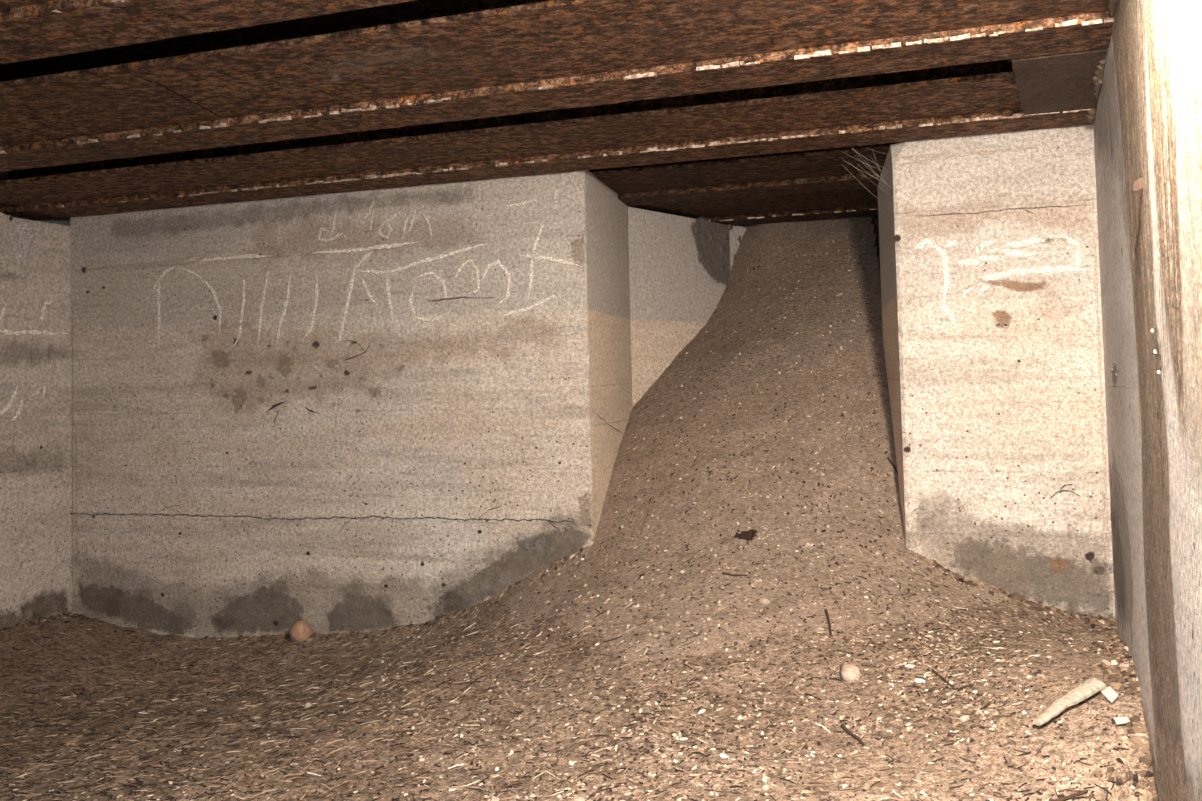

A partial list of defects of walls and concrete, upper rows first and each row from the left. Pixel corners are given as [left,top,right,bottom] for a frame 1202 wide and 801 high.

water stain [955,213,1112,618]
water stain [71,310,190,634]
water stain [212,587,301,632]
water stain [328,595,396,632]
water stain [429,529,588,617]